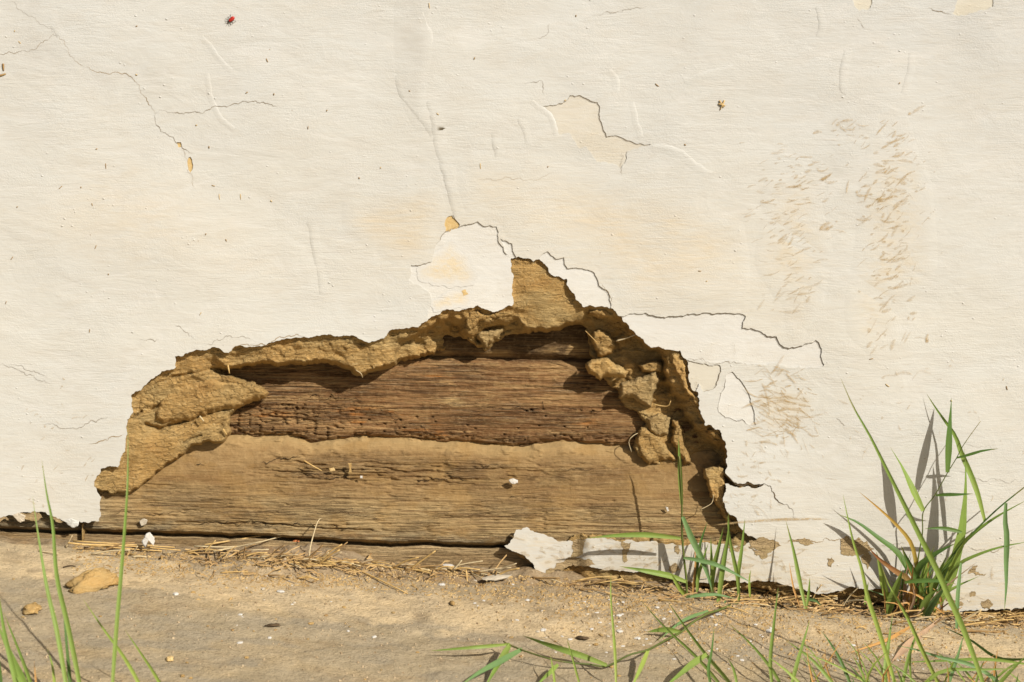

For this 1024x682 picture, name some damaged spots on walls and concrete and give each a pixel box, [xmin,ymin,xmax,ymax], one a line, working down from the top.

crack [2,2,273,185]
spalling [94,216,824,559]
crack [543,251,822,426]
spalling [546,538,595,574]
spalling [621,541,631,563]